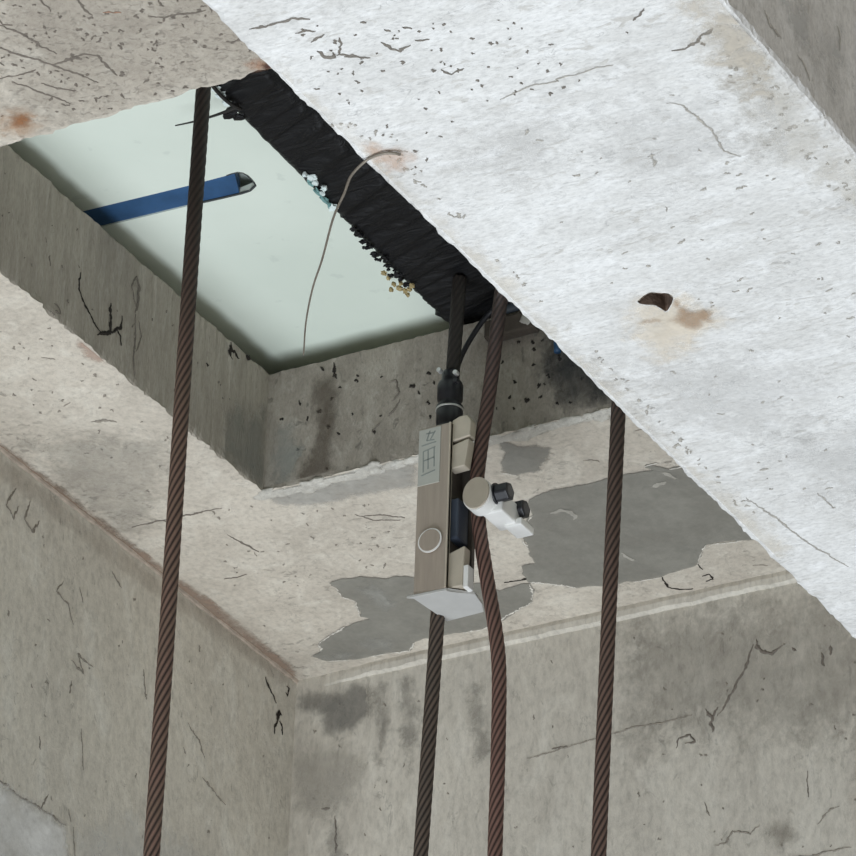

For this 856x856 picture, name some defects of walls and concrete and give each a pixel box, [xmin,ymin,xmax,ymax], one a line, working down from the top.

crack [0,20,118,104]
crack [78,272,142,375]
spalling [638,292,705,343]
corrosion [680,310,708,326]
leakage [544,339,609,402]
peeling [500,442,550,476]
peeling [496,479,608,621]
peeling [618,462,755,584]
leakage [305,689,368,729]
crack [527,640,796,759]
leakage [0,788,67,856]